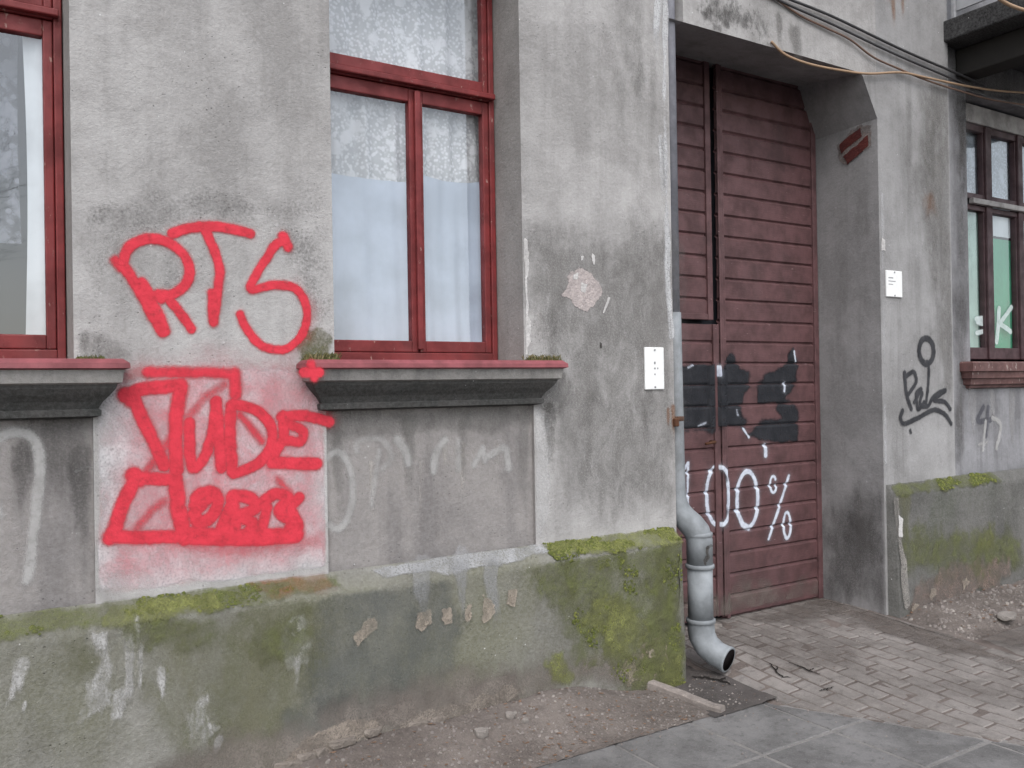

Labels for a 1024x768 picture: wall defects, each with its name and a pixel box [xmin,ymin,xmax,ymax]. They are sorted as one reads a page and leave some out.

spalling [562,253,602,312]
spalling [416,607,452,631]
spalling [465,589,517,623]